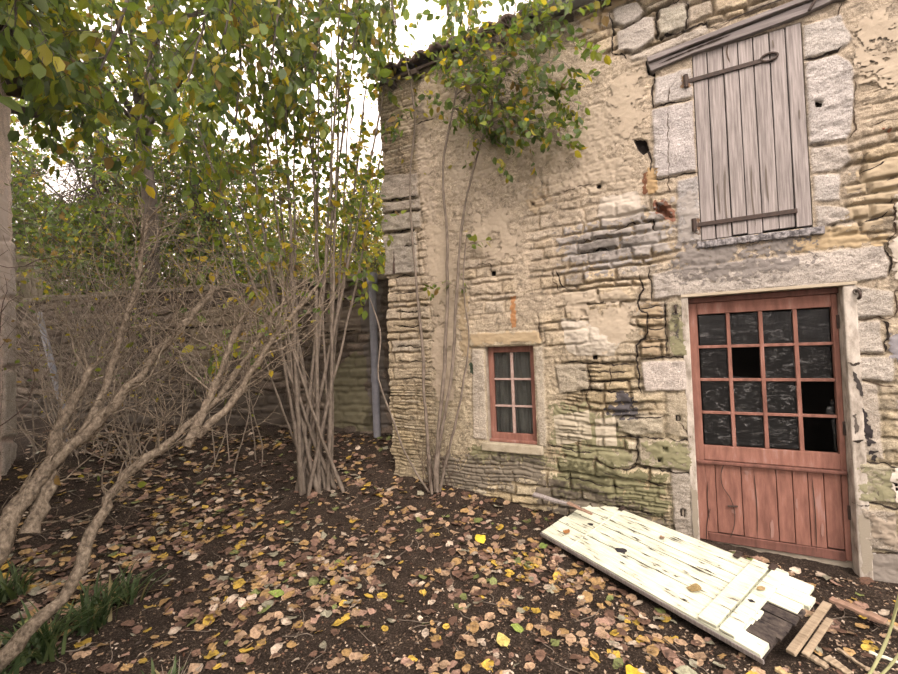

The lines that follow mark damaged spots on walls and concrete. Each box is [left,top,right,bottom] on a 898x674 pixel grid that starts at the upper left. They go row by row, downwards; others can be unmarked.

peeling [851,2,898,92]
corrosion [642,167,676,222]
spalling [788,147,898,279]
crack [565,266,684,407]
water stain [424,452,676,531]
crack [545,415,691,519]
spalling [868,514,898,551]
peeling [890,468,898,503]